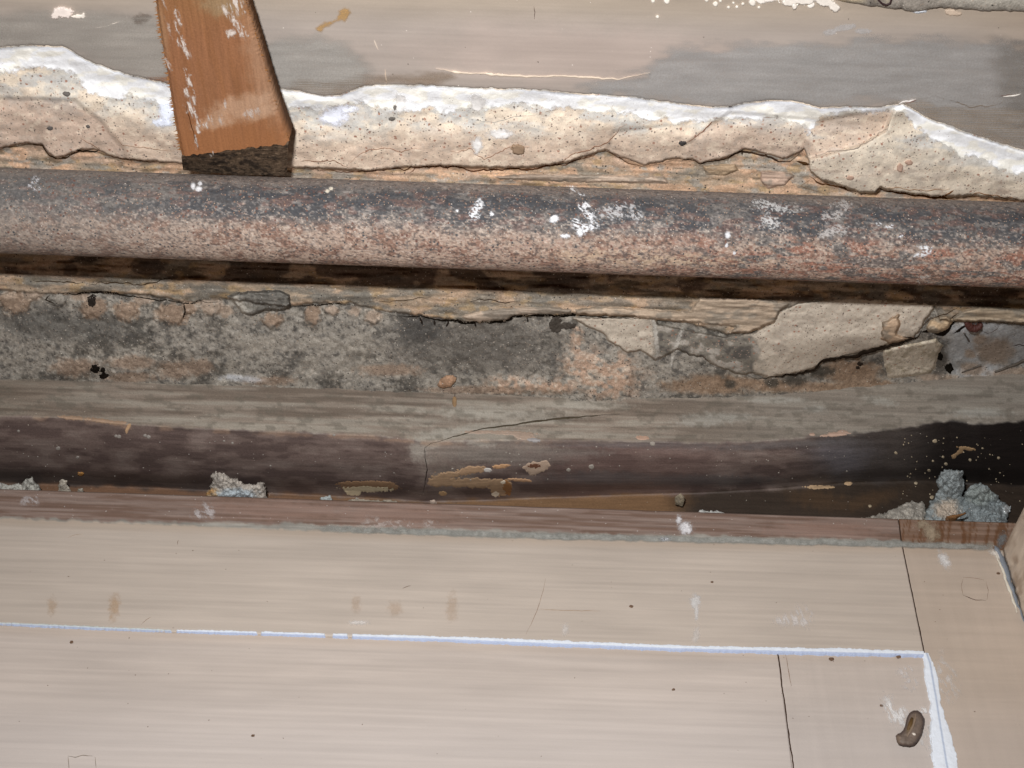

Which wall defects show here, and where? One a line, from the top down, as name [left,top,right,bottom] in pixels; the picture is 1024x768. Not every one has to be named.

crack [939,94,1020,108]
crack [0,135,166,163]
crack [304,126,642,173]
crack [668,106,1016,200]
crack [33,278,215,318]
crack [295,297,638,327]
peeling [462,297,792,334]
peeling [880,314,906,344]
peeling [926,306,1024,333]
crack [423,414,612,491]
peeling [336,486,394,496]
peeling [484,464,541,497]